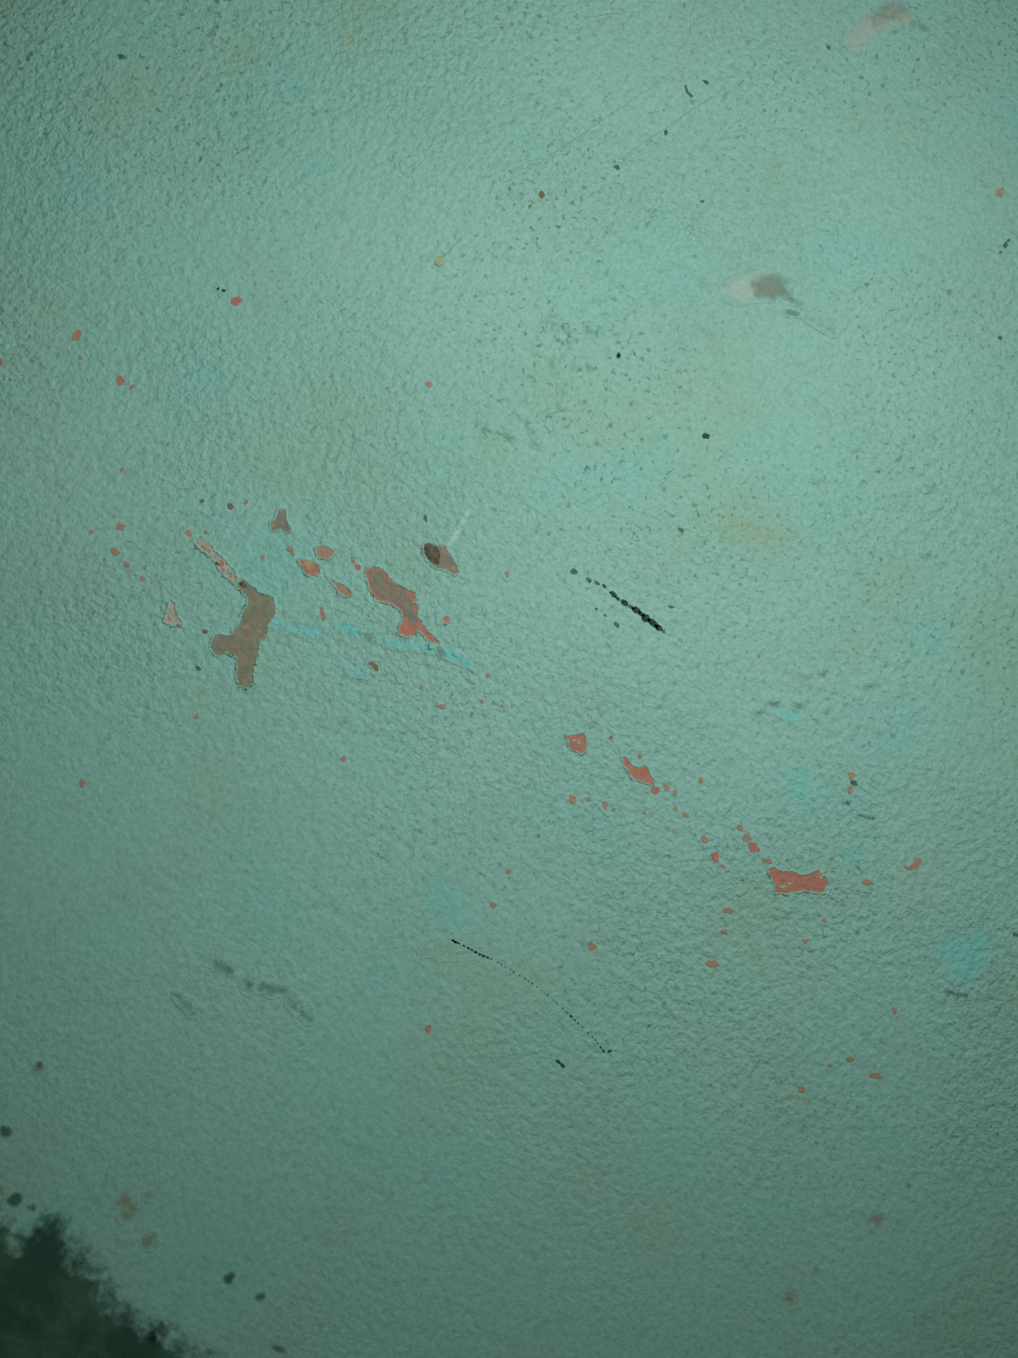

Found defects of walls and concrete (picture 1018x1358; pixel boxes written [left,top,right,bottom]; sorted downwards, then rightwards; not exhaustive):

peeling [420,540,462,577]
peeling [268,507,452,650]
peeling [162,599,184,628]
peeling [186,530,279,691]
peeling [563,731,589,757]
peeling [569,795,616,812]
peeling [619,754,689,818]
peeling [701,824,831,897]
peeling [904,857,922,870]